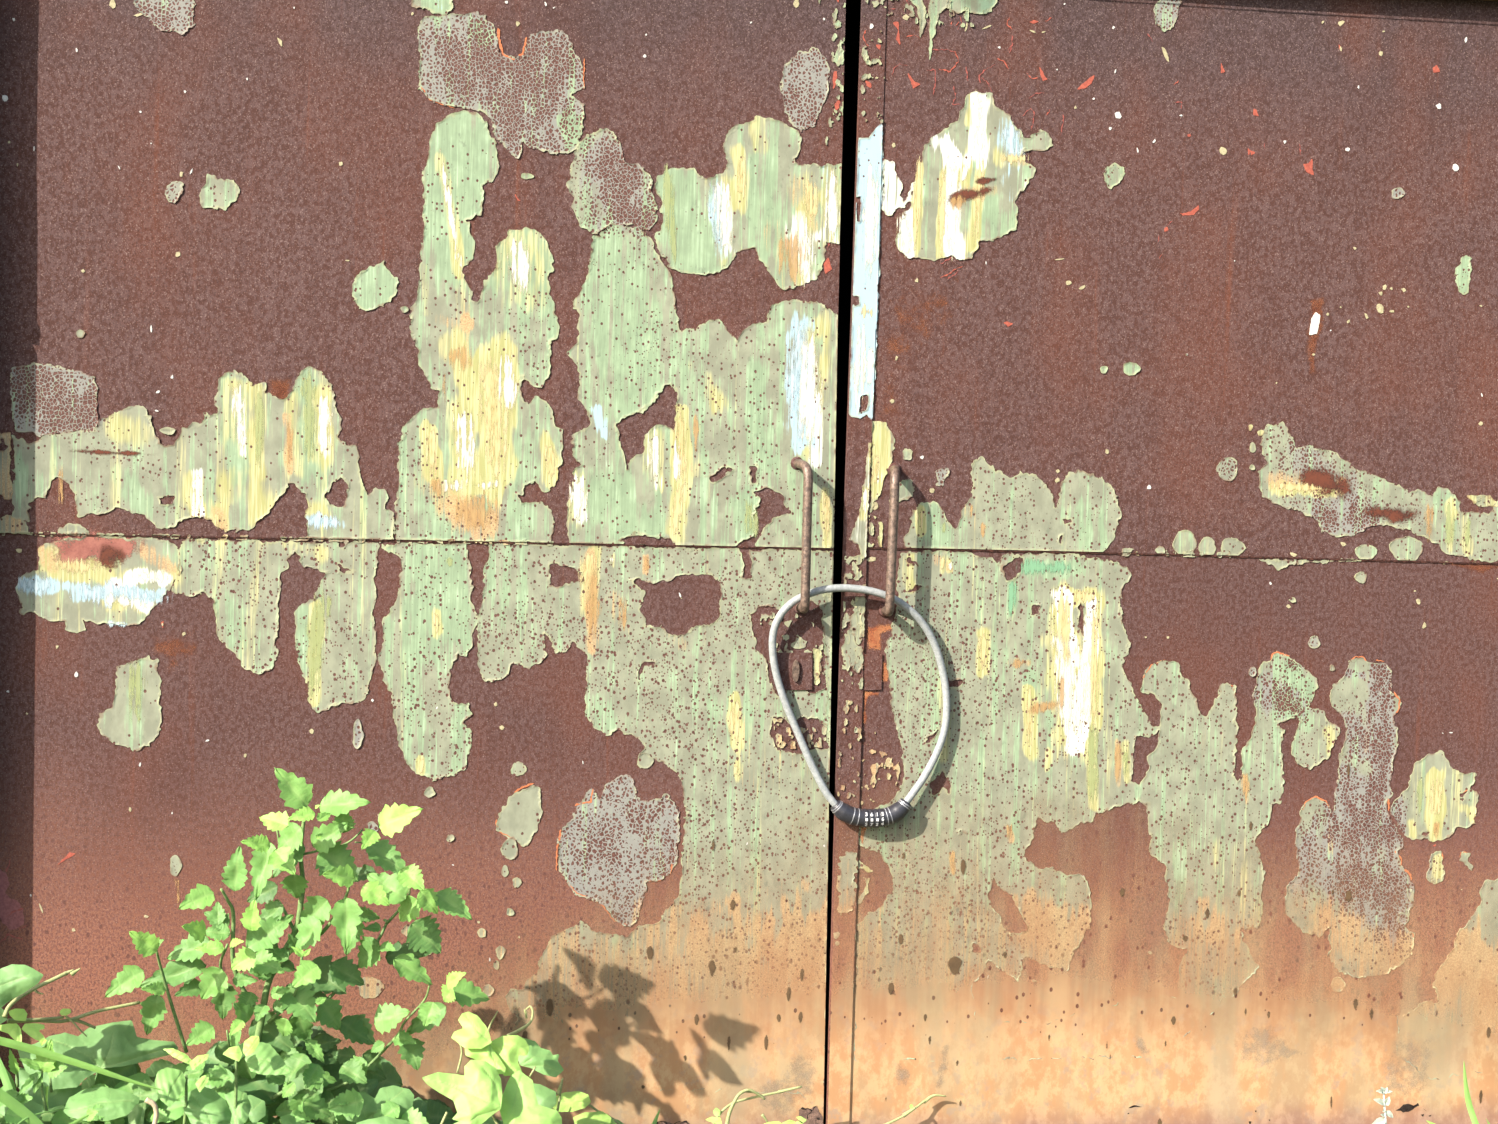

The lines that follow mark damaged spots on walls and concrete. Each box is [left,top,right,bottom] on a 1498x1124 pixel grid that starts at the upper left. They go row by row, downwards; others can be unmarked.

peeling [861,30,882,100]
peeling [865,0,997,60]
peeling [1153,0,1182,32]
peeling [1104,163,1126,189]
peeling [1455,255,1472,295]
peeling [841,91,1053,689]
peeling [0,0,846,1023]
peeling [1216,421,1498,583]
corrosion [863,625,891,723]
peeling [836,456,1479,999]
peeling [1396,878,1498,1080]
corrosion [799,1106,823,1124]